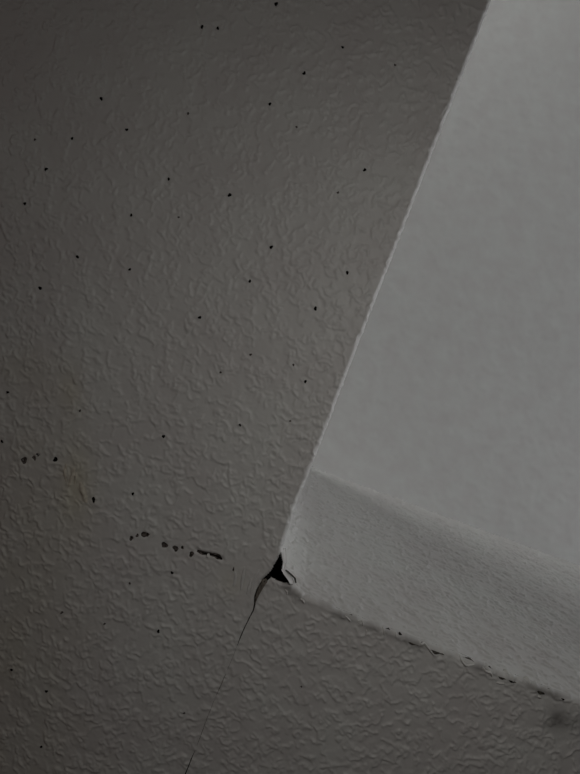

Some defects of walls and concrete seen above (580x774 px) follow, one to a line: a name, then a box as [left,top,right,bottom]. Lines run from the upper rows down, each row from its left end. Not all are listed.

crack [185,605,255,774]